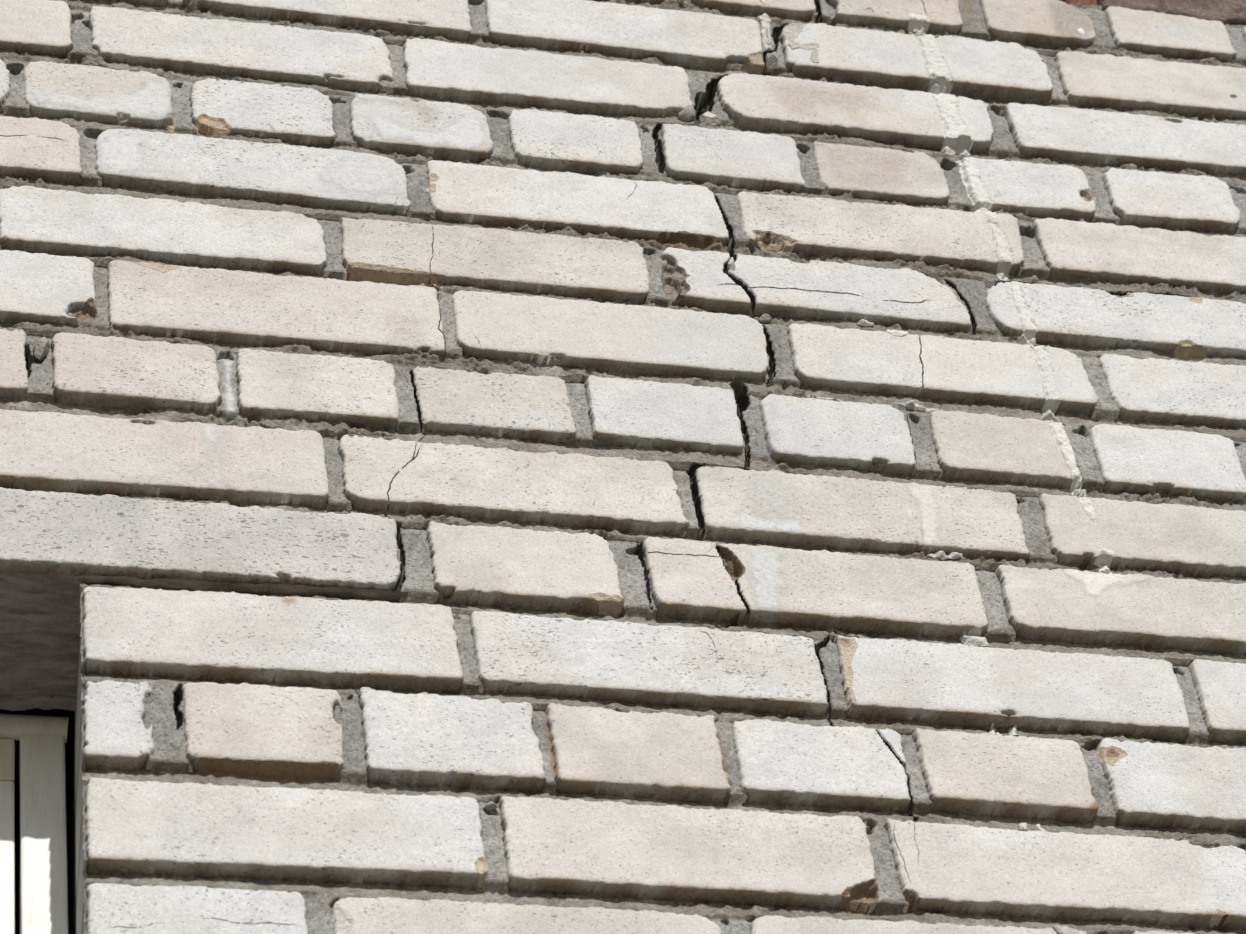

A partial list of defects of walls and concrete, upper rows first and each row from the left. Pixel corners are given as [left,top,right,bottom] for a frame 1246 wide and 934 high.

crack [760,0,786,76]
crack [814,0,822,23]
crack [627,76,724,199]
leakage [907,13,1098,526]
crack [635,194,977,646]
spalling [719,545,746,581]
crack [814,633,859,727]
crack [875,730,919,882]
spalling [839,878,879,915]